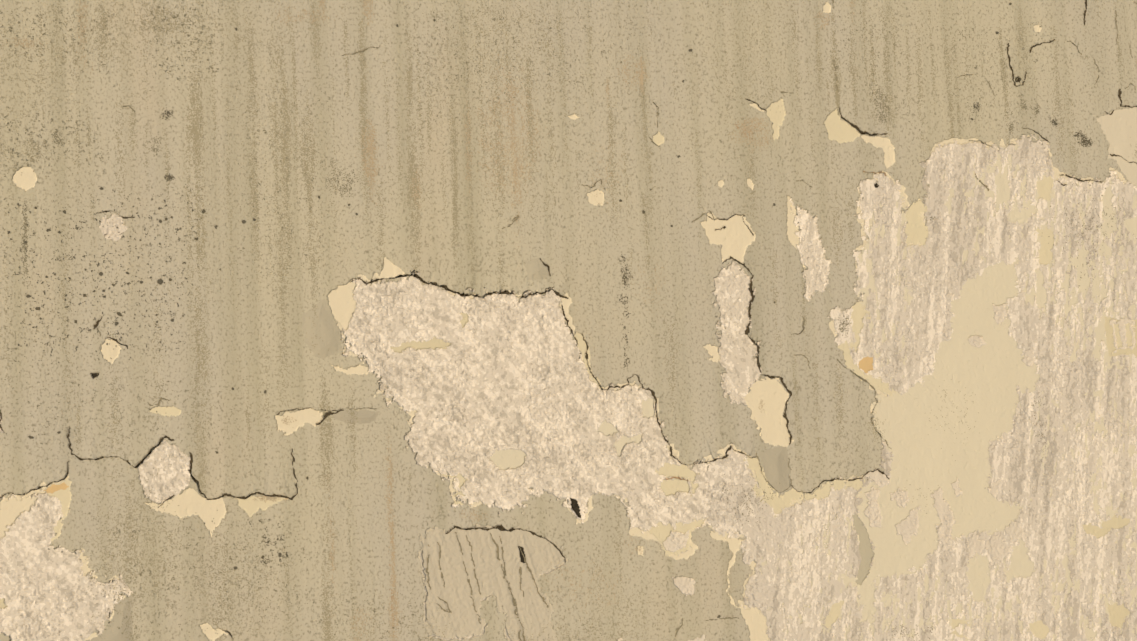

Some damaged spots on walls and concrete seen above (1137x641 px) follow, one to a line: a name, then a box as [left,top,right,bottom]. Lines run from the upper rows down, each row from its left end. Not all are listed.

crack [957,0,1137,115]
damp [0,0,656,641]
peeling [337,132,1137,641]
crack [0,426,298,508]
peeling [138,440,191,503]
peeling [0,480,133,641]
peeling [200,623,228,641]